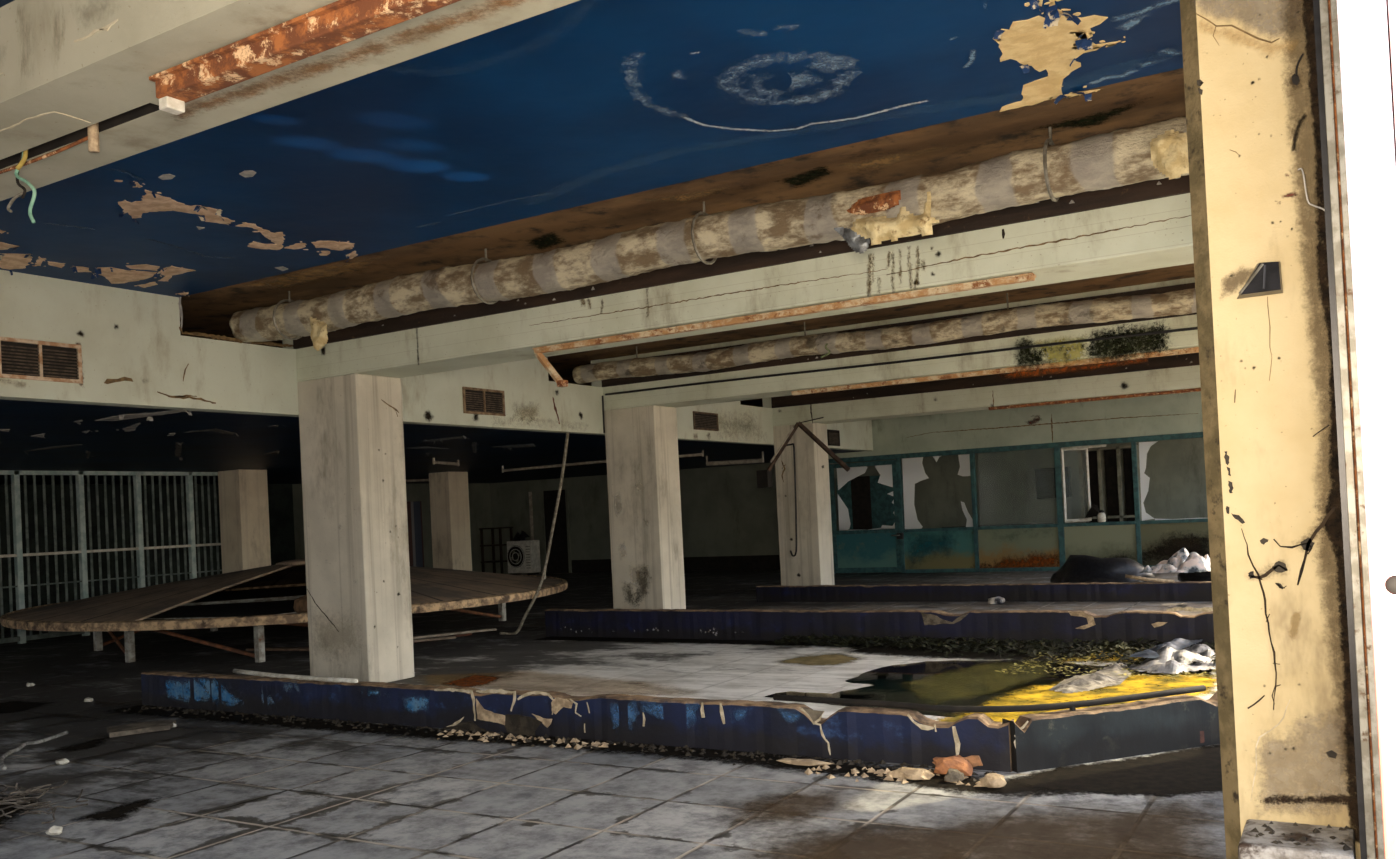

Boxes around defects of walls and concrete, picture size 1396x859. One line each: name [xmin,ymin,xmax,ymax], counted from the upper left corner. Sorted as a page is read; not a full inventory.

corrosion [181,44,384,117]
corrosion [400,0,515,41]
peeling [993,0,1126,112]
peeling [114,174,358,271]
peeling [0,230,293,347]
damp [1015,322,1171,369]
damp [1195,0,1360,843]
crack [1241,507,1336,802]
spalling [444,697,573,736]
peeling [611,702,667,725]
spalling [932,755,983,776]
damp [734,792,1224,859]